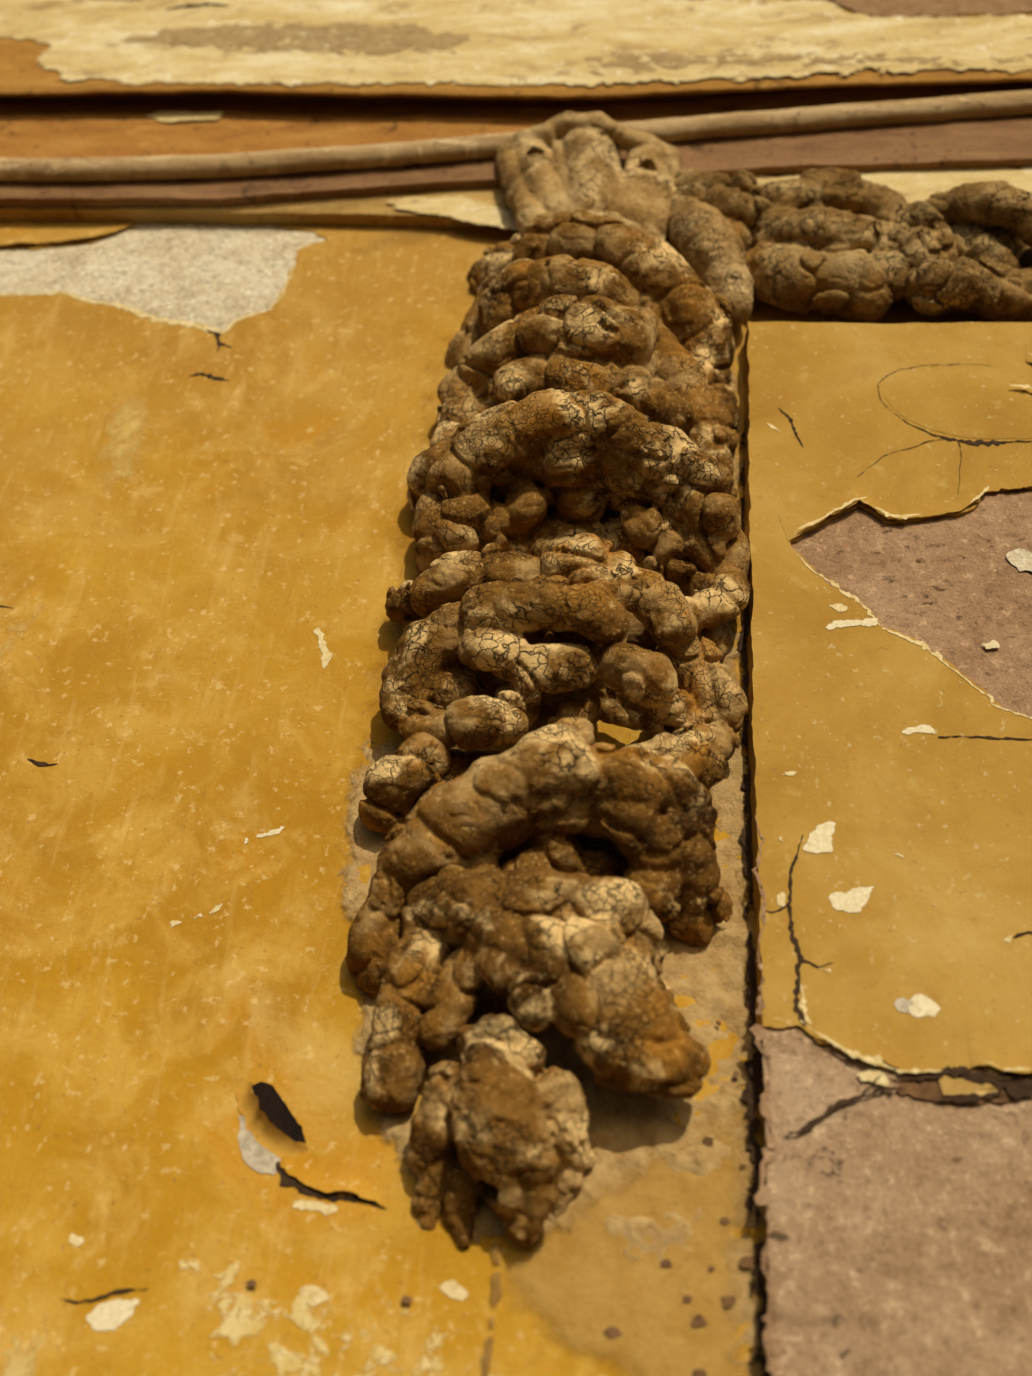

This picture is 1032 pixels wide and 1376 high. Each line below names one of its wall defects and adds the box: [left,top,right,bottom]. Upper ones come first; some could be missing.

peeling [0,0,1032,87]
peeling [860,167,1032,203]
peeling [0,222,326,334]
crack [739,407,803,533]
crack [861,364,1031,493]
flaking render [778,471,1032,719]
crack [938,734,1032,742]
crack [737,602,907,1376]
peeling [236,1081,391,1216]
flaking render [739,815,1032,1376]
peeling [61,1288,149,1331]
peeling [179,1259,449,1376]